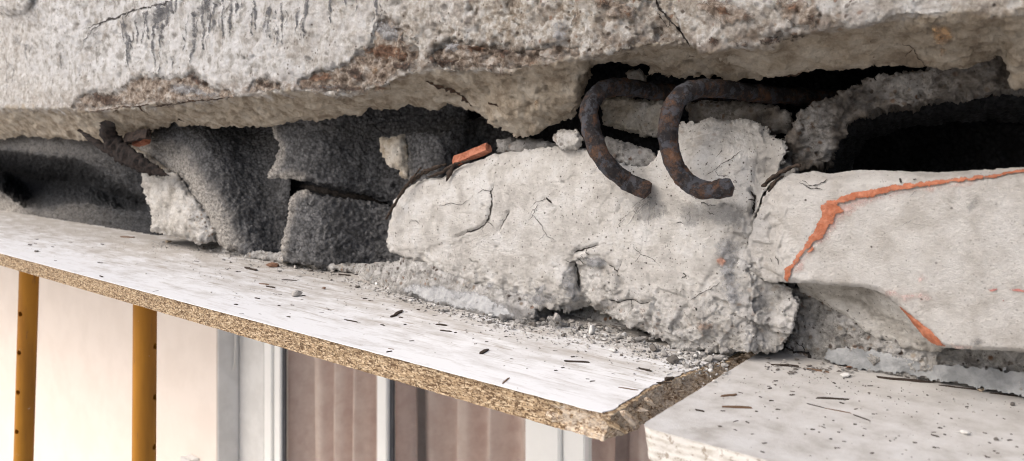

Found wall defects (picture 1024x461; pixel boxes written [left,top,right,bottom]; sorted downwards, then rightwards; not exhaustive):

crack [83,0,172,43]
water stain [120,0,177,72]
water stain [182,0,309,64]
rust [77,120,169,177]
crack [442,188,655,304]
spalling [784,169,1024,352]